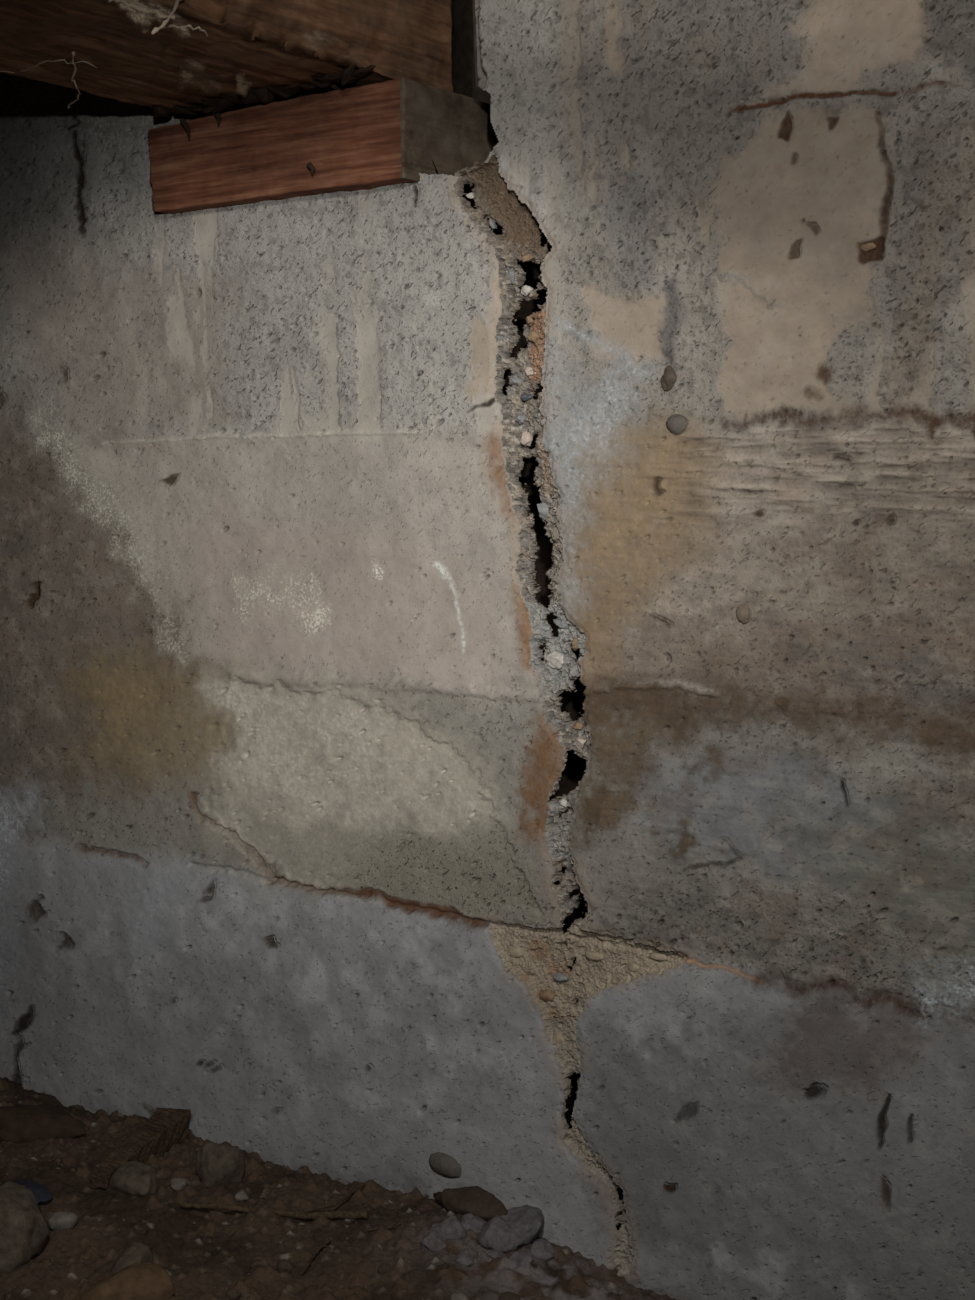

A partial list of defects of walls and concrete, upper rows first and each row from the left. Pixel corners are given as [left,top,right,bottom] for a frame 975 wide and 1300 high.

crack [73,131,86,233]
leakage [28,390,191,661]
leakage [545,321,975,828]
crack [414,155,634,1276]
crack [192,793,488,927]